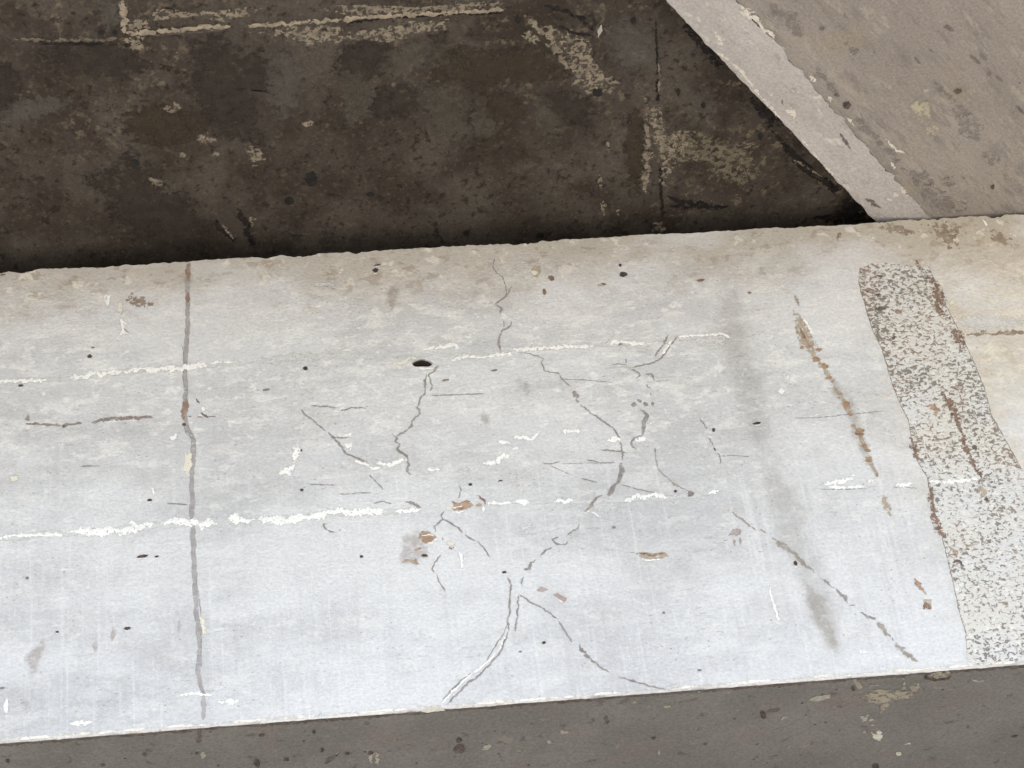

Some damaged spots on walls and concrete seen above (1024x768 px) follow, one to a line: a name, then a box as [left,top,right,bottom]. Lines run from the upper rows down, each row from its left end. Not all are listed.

corrosion [915,260,965,349]
crack [25,415,153,428]
crack [492,259,684,517]
corrosion [793,299,879,477]
corrosion [924,389,988,502]
crack [181,261,216,744]
spalling [403,531,465,568]
spalling [446,496,486,514]
crack [422,532,666,713]
crack [739,517,918,662]
corrosion [914,578,932,609]
corrosion [927,488,963,566]